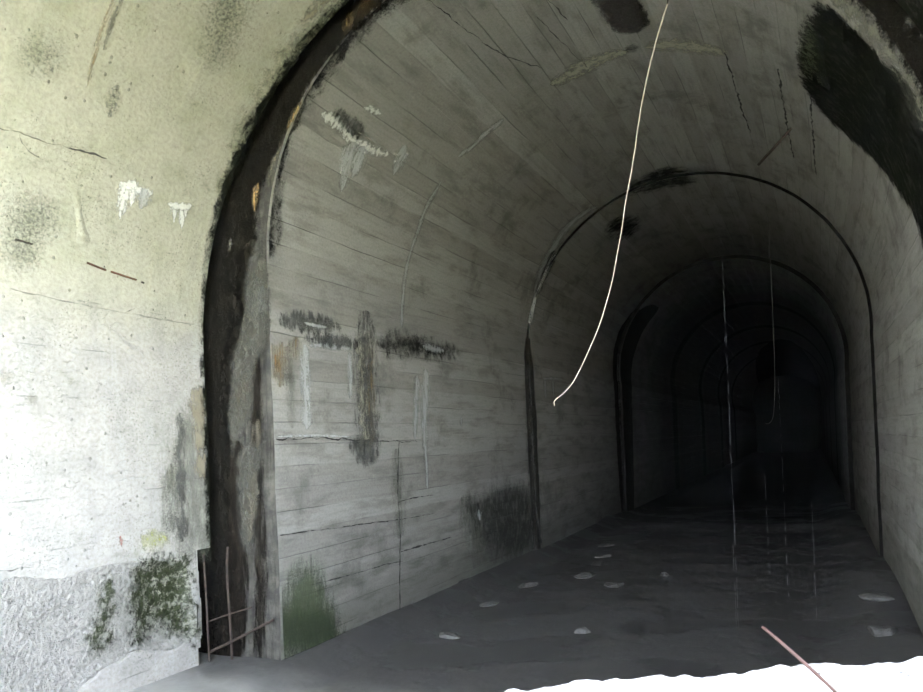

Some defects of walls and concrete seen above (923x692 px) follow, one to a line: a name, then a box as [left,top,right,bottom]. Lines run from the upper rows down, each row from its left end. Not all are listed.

rust [88,0,120,78]
crack [0,128,107,159]
leakage [117,180,153,219]
leakage [168,202,192,229]
leakage [605,216,639,239]
leakage [625,167,696,196]
leakage [797,0,923,248]
leakage [197,0,407,658]
leakage [280,181,458,489]
leakage [175,413,188,542]
leakage [467,337,542,560]
leakage [613,304,659,512]